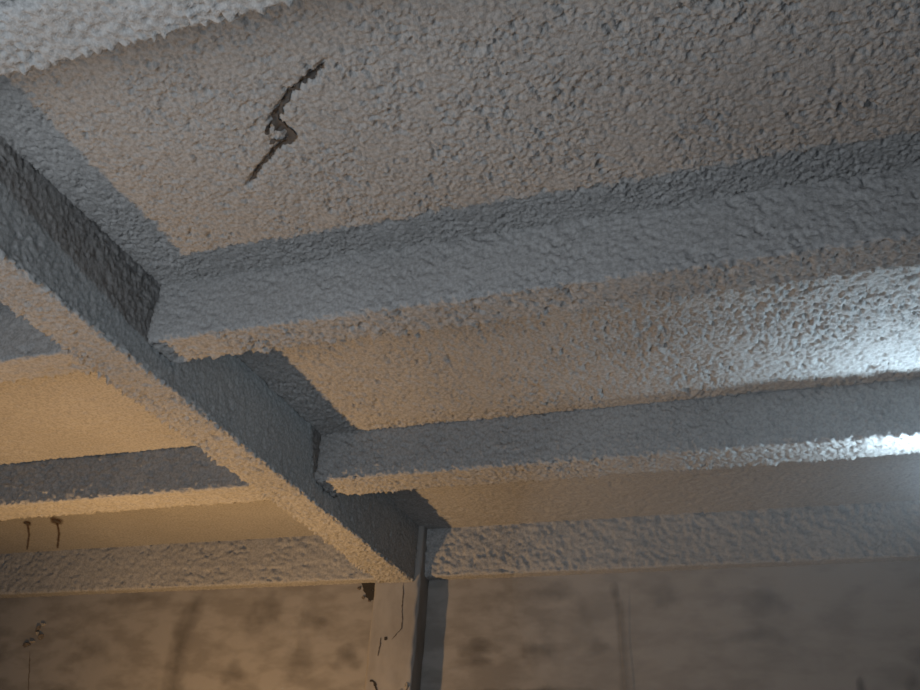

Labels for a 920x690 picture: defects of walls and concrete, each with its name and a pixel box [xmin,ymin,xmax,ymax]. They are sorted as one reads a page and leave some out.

crack [249,62,324,182]